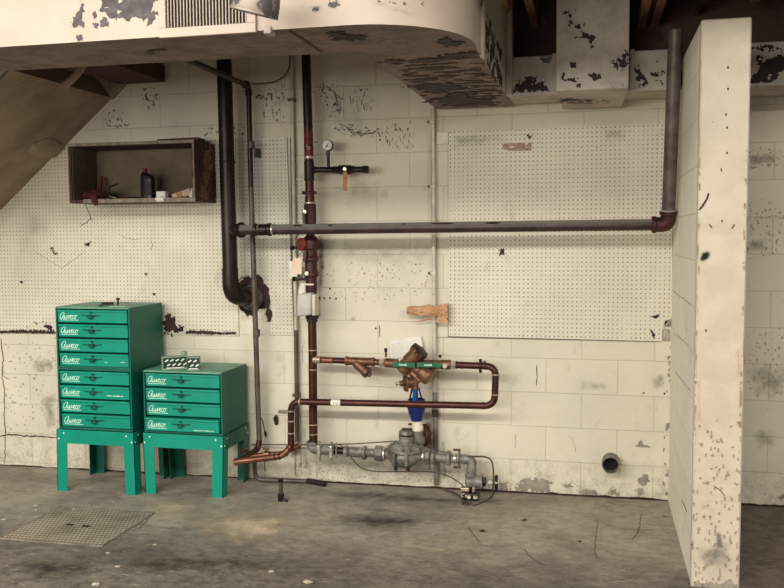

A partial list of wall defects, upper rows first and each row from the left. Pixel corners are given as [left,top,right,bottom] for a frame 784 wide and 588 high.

peeling [70,0,158,41]
peeling [326,30,372,41]
peeling [562,11,600,49]
peeling [384,19,549,106]
peeling [561,62,602,88]
peeling [610,50,665,91]
peeling [750,44,784,87]
spalling [238,275,272,322]
crack [0,341,57,461]
peeling [690,328,784,588]
spalling [499,476,620,497]
spalling [635,474,650,496]